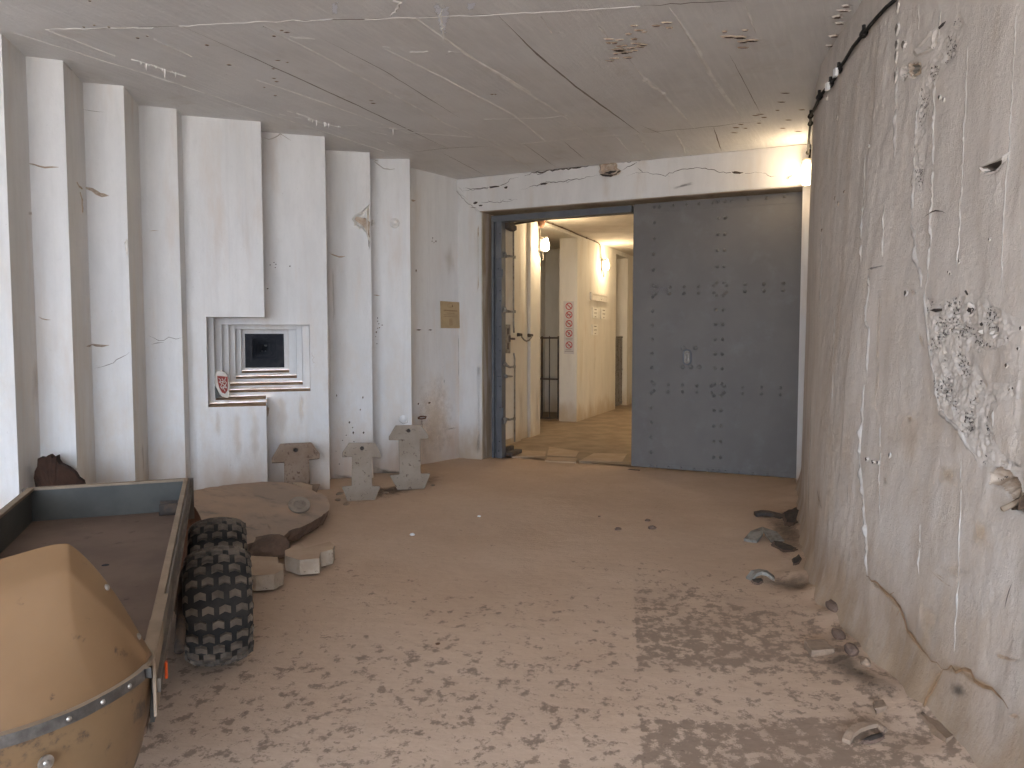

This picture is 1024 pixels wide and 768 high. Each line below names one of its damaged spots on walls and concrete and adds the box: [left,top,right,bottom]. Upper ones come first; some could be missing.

spalling [604,21,673,62]
spalling [894,1,961,126]
spalling [979,151,1011,175]
crack [77,182,108,213]
crack [458,166,596,208]
spalling [352,205,375,245]
crack [87,343,124,368]
spalling [923,290,1024,512]
crack [867,576,1008,708]